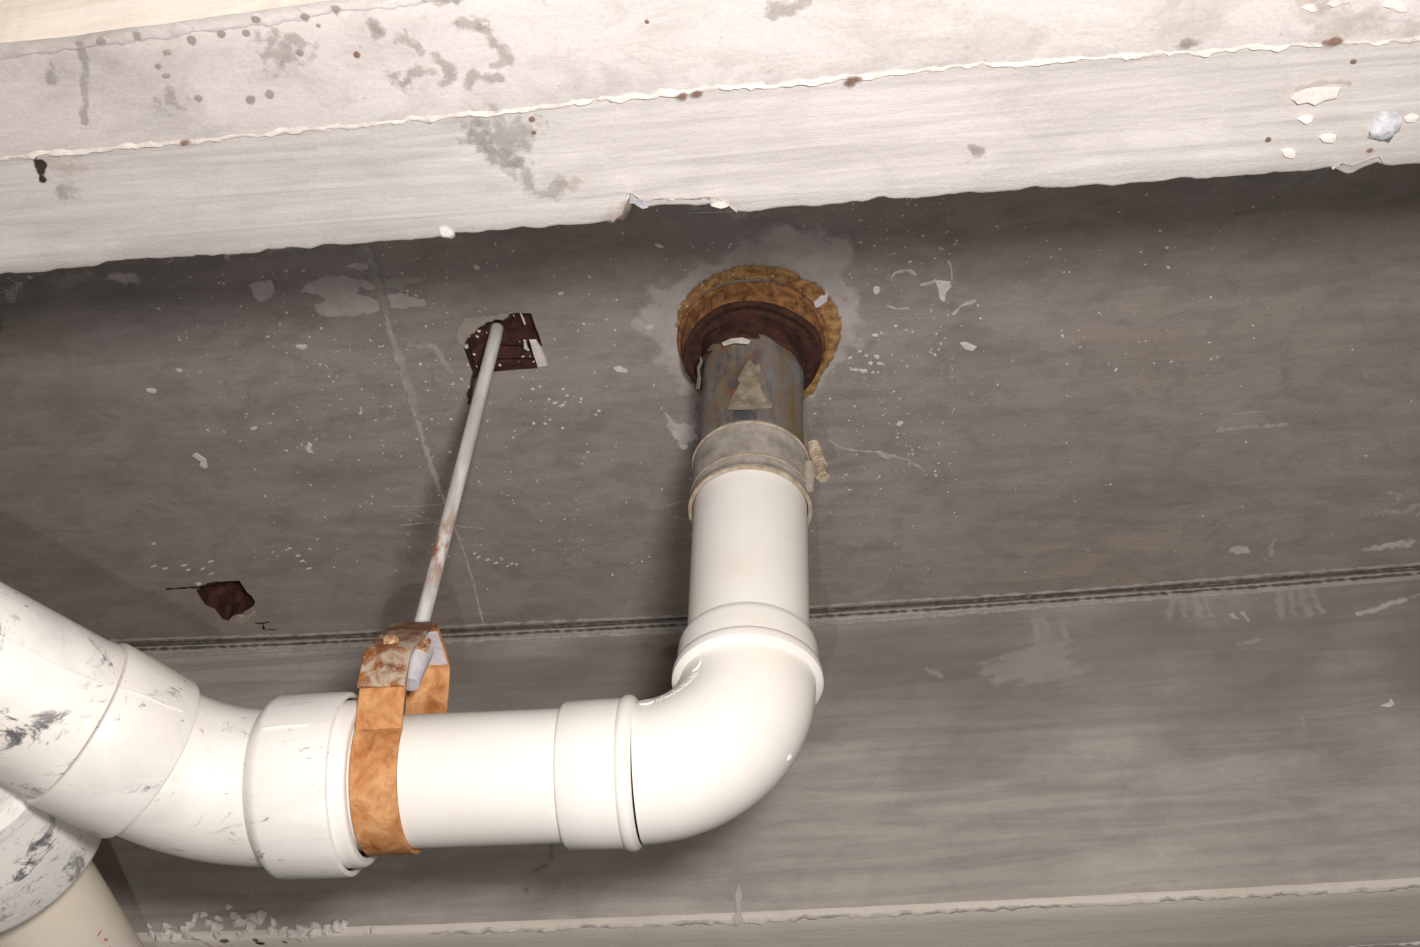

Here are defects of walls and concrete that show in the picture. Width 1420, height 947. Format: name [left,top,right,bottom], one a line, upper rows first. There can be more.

rust [456,313,548,404]
rust [676,264,842,399]
rust [166,581,257,625]